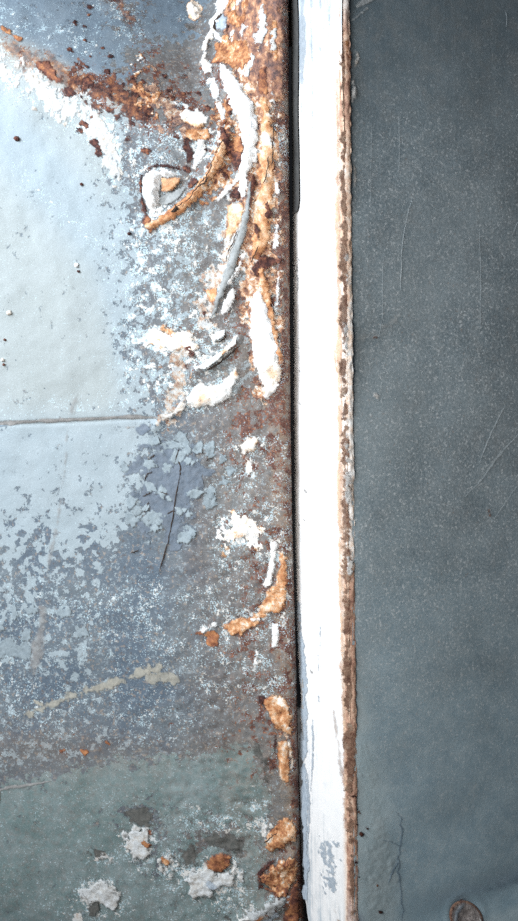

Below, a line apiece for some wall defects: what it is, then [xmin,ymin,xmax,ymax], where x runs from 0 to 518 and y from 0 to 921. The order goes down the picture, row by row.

rust [35,0,285,431]
peeling [144,325,239,420]
peeling [249,268,283,398]
crack [158,461,181,574]
peeling [120,430,260,554]
rust [195,553,289,647]
peeling [216,509,279,588]
rust [333,30,369,919]
rust [258,695,295,783]
spalling [72,878,122,921]
spalling [121,807,248,899]
rust [257,817,300,921]